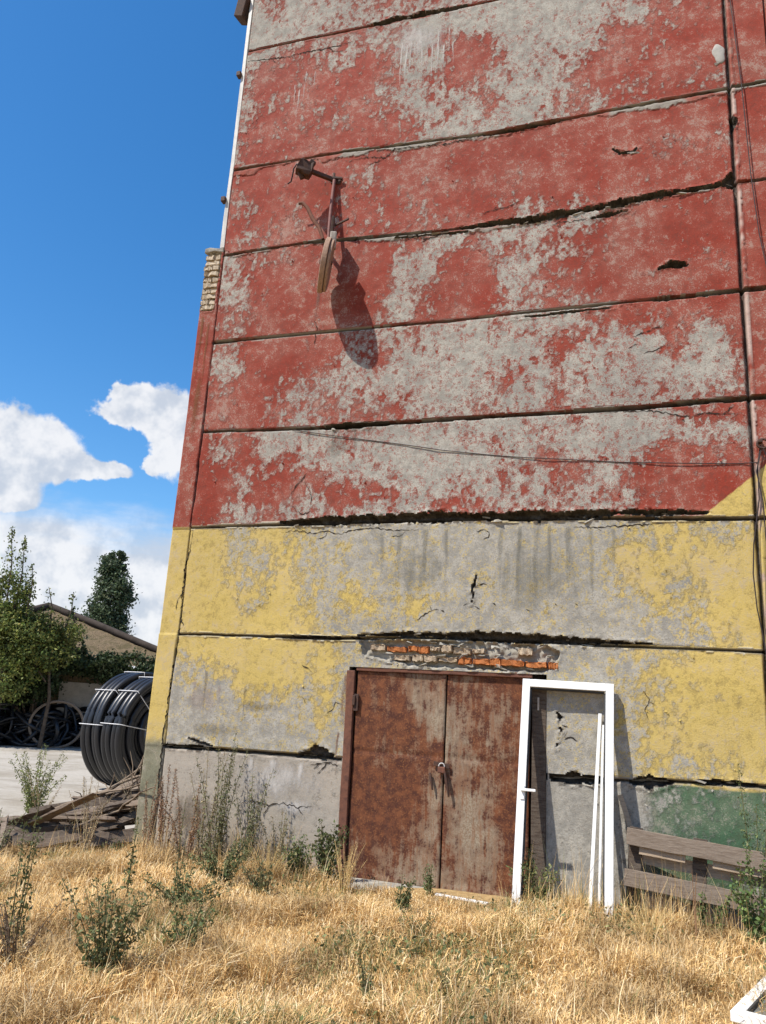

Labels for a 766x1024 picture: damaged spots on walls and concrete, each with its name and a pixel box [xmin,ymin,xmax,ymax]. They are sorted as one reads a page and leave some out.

crack [346,136,479,165]
peeling [166,0,766,907]
crack [579,523,663,531]
crack [242,800,309,814]